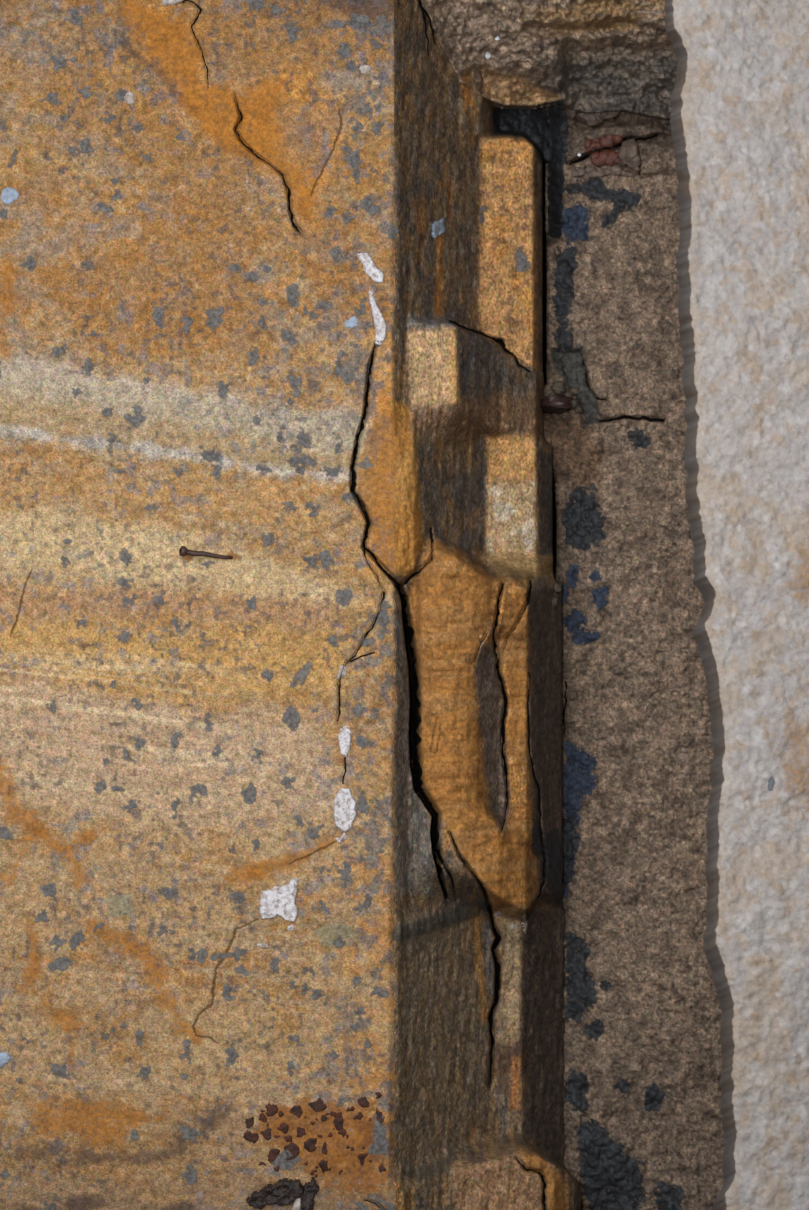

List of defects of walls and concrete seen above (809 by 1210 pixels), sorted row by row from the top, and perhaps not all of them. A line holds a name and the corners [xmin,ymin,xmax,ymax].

crack [418,0,435,55]
crack [183,0,342,233]
crack [337,345,501,1088]
crack [474,481,556,899]
crack [291,840,337,863]
crack [193,919,258,1043]
corrosion [243,1092,390,1178]